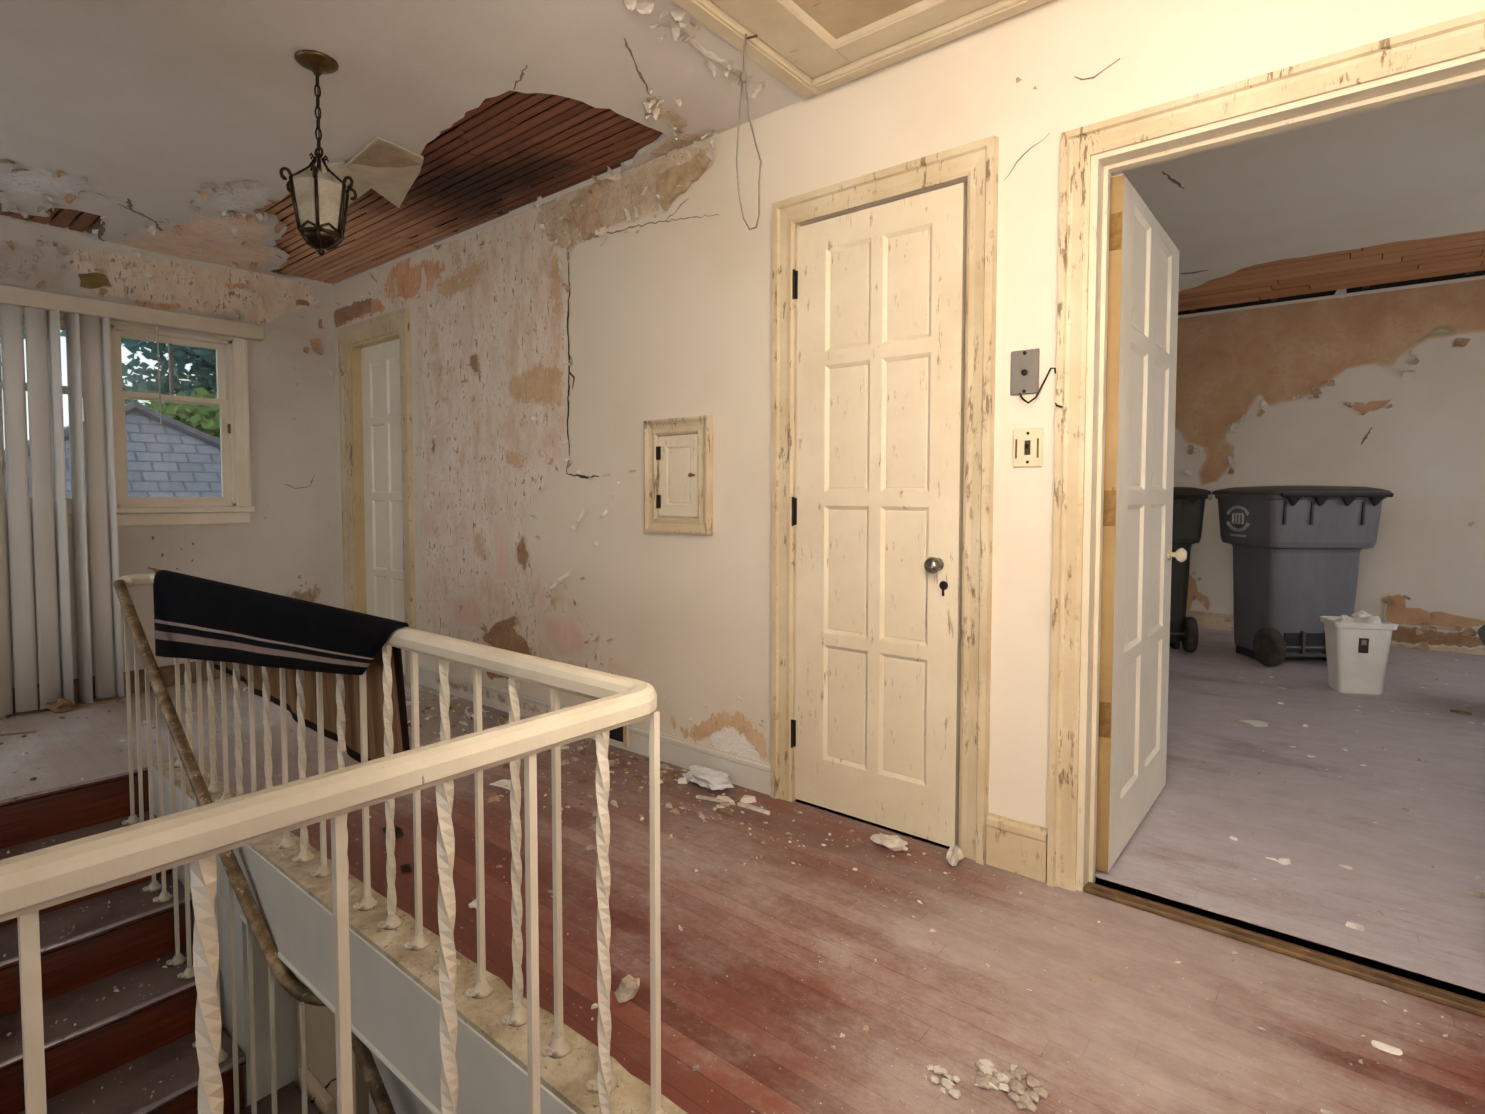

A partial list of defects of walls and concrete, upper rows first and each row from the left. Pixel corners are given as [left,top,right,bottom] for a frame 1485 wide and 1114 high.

peeling [623,0,765,98]
peeling [0,159,110,218]
peeling [67,89,771,764]
crack [566,198,718,479]
peeling [1175,279,1485,500]
spalling [1381,593,1485,651]